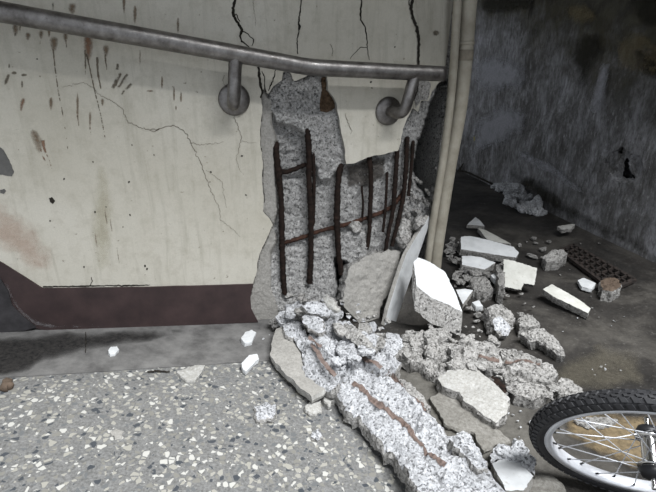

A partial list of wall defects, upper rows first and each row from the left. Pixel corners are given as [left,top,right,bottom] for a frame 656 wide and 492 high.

crack [232,0,256,47]
crack [295,0,303,54]
crack [350,0,370,60]
crack [409,0,421,65]
rust [320,77,335,113]
peeling [0,148,14,176]
crack [68,82,239,236]
spalling [605,146,643,184]
spalling [250,72,449,320]